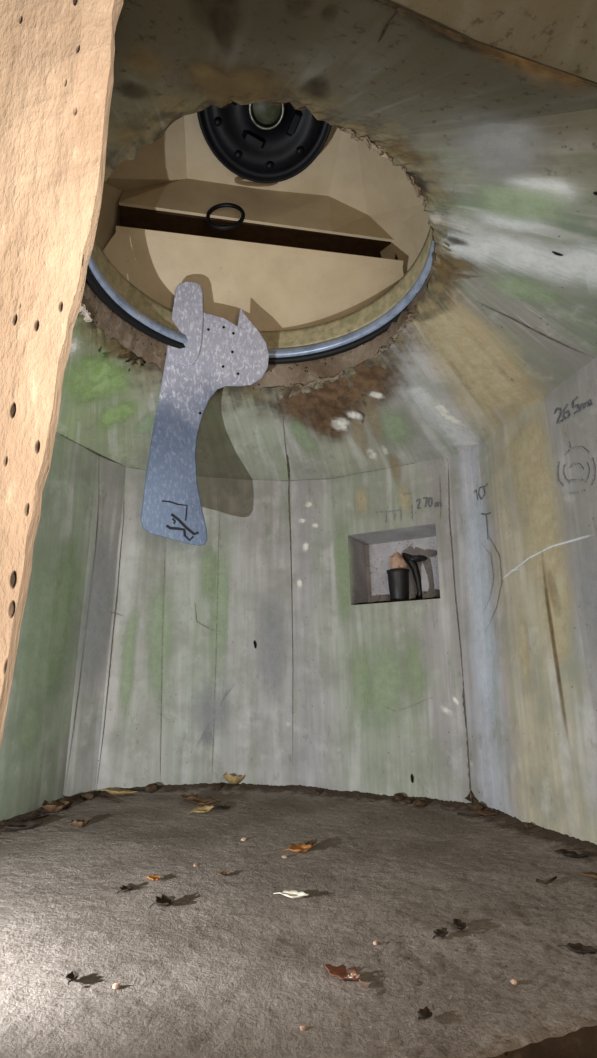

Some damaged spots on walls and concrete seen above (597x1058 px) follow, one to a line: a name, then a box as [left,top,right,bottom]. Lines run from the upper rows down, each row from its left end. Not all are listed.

crack [374,0,597,87]
corrosion [278,361,393,448]